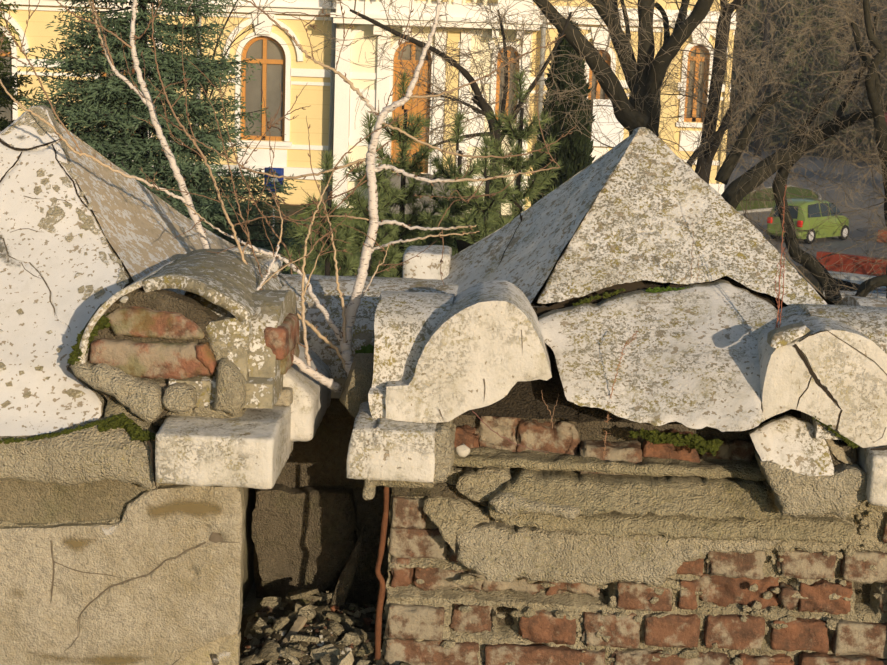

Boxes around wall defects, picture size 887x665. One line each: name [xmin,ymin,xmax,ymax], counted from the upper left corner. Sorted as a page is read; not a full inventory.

crack [0,139,95,212]
crack [0,228,70,328]
flaking render [21,161,249,426]
flaking render [264,313,300,375]
crack [793,330,887,433]
flaking render [445,466,464,485]
crack [50,541,238,651]
flaking render [179,487,887,665]